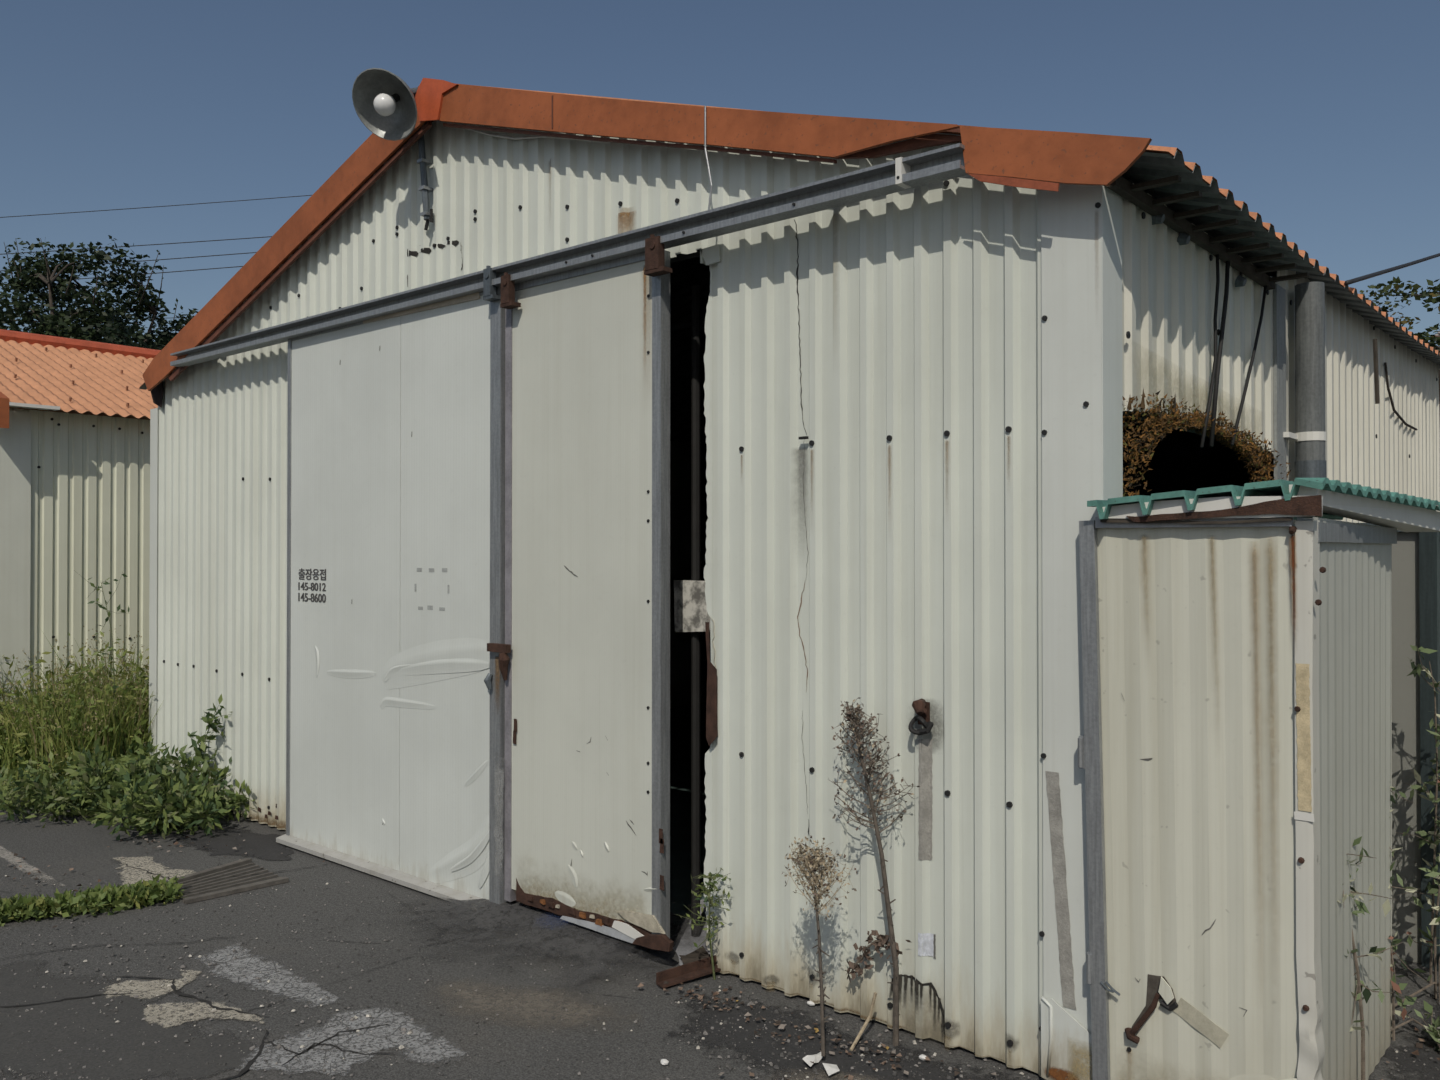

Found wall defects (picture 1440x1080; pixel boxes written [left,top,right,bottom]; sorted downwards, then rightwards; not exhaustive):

crack [794,220,809,834]
corrosion [1289,526,1297,611]
corrosion [516,878,674,952]
damp [890,974,946,1045]